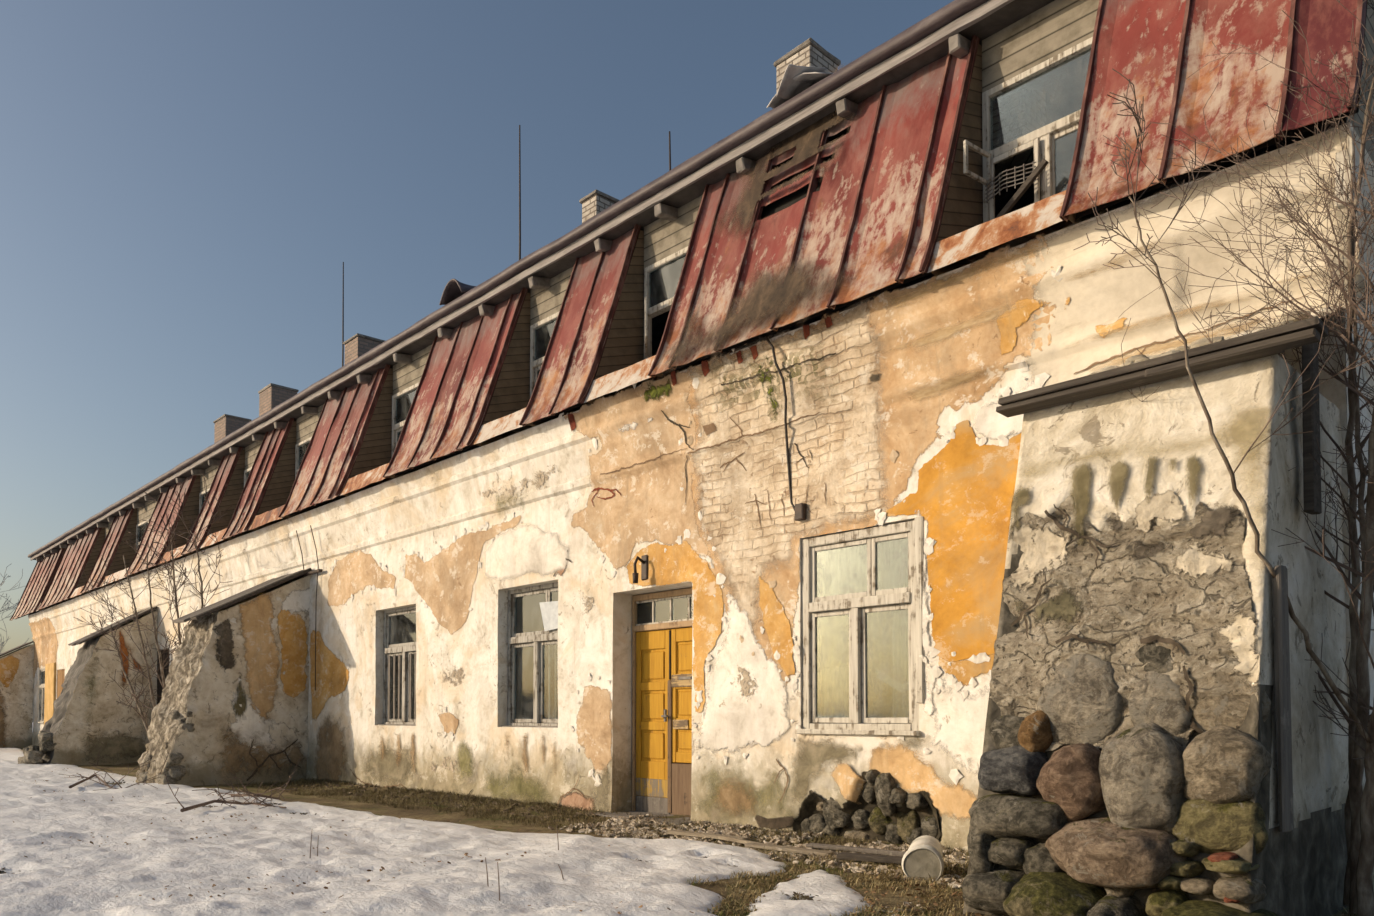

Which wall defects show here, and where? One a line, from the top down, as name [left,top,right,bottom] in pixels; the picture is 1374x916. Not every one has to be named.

flaking render [327,465,555,634]
crack [591,410,826,526]
corrosion [665,263,835,386]
crack [721,353,836,386]
flaking render [558,129,1351,702]
leakage [1010,469,1035,530]
crack [1044,504,1117,569]
leakage [1071,450,1128,543]
leakage [1145,455,1201,505]
crack [1011,578,1203,734]
flaking render [560,672,612,810]
flaking render [755,736,977,845]